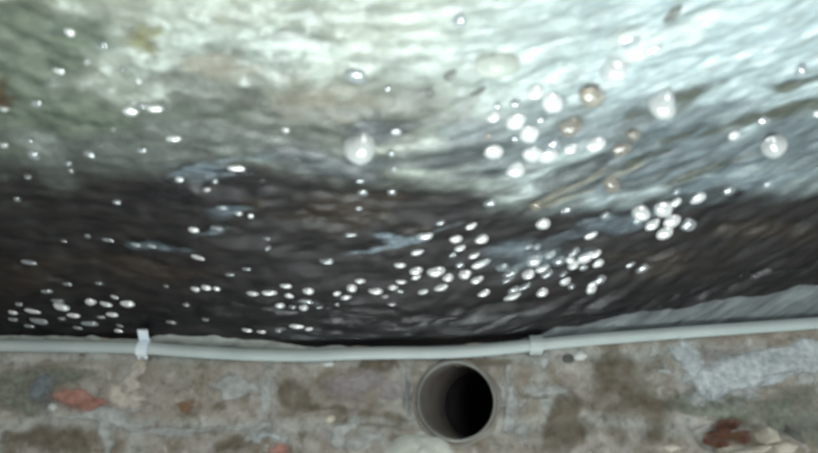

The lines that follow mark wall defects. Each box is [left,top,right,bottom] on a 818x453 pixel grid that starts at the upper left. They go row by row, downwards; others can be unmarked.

leakage [0,2,818,347]